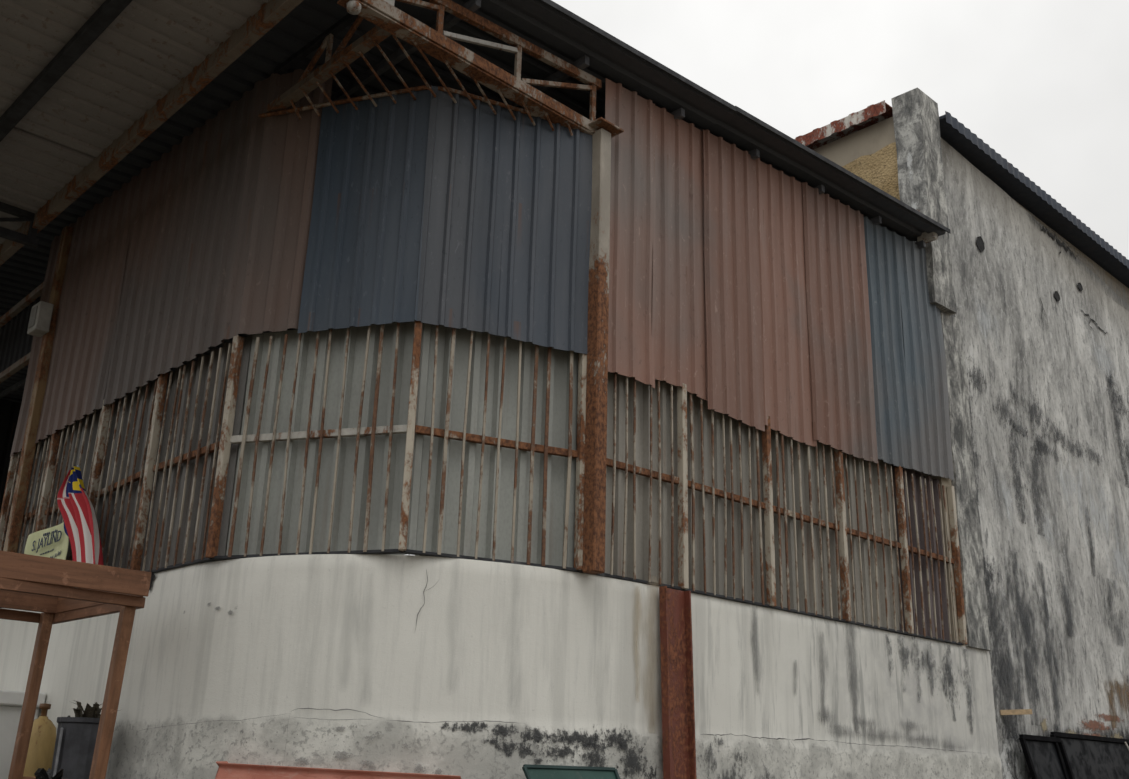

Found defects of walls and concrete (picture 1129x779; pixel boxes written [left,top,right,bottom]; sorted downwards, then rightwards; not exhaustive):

water stain [1096,349,1129,487]
water stain [967,367,1127,646]
water stain [839,617,885,740]
water stain [886,634,973,733]
water stain [982,547,1073,779]
water stain [700,739,748,779]